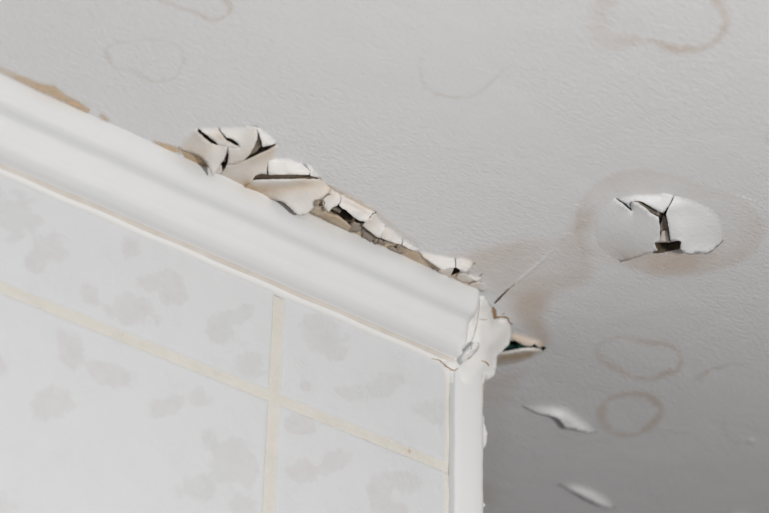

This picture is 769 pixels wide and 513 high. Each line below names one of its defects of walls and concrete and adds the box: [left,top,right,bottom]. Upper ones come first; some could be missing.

peeling [178,126,485,292]
peeling [457,342,479,365]
peeling [497,332,546,367]
peeling [521,403,597,433]
peeling [558,482,616,509]